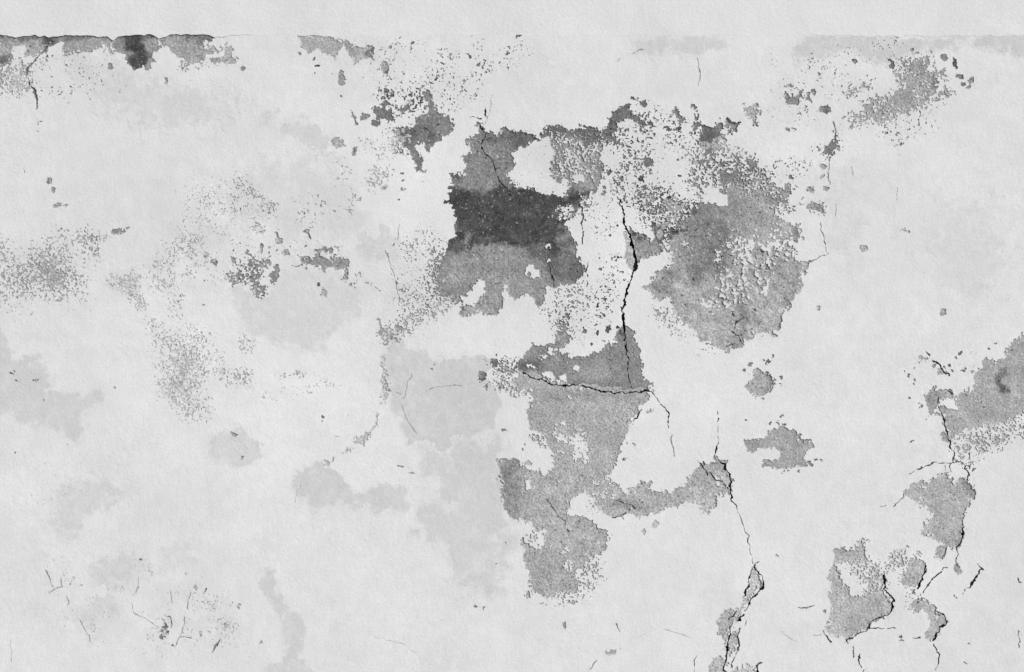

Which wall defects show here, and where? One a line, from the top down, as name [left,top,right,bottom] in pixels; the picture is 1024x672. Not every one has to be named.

peeling [0,35,130,99]
water stain [121,35,152,70]
peeling [143,34,246,85]
peeling [351,88,455,172]
water stain [443,179,597,284]
peeling [449,51,974,356]
peeling [323,238,576,466]
peeling [483,315,735,607]
crack [522,199,764,672]
peeling [822,331,1024,644]
crack [880,351,971,507]
crack [781,524,984,672]